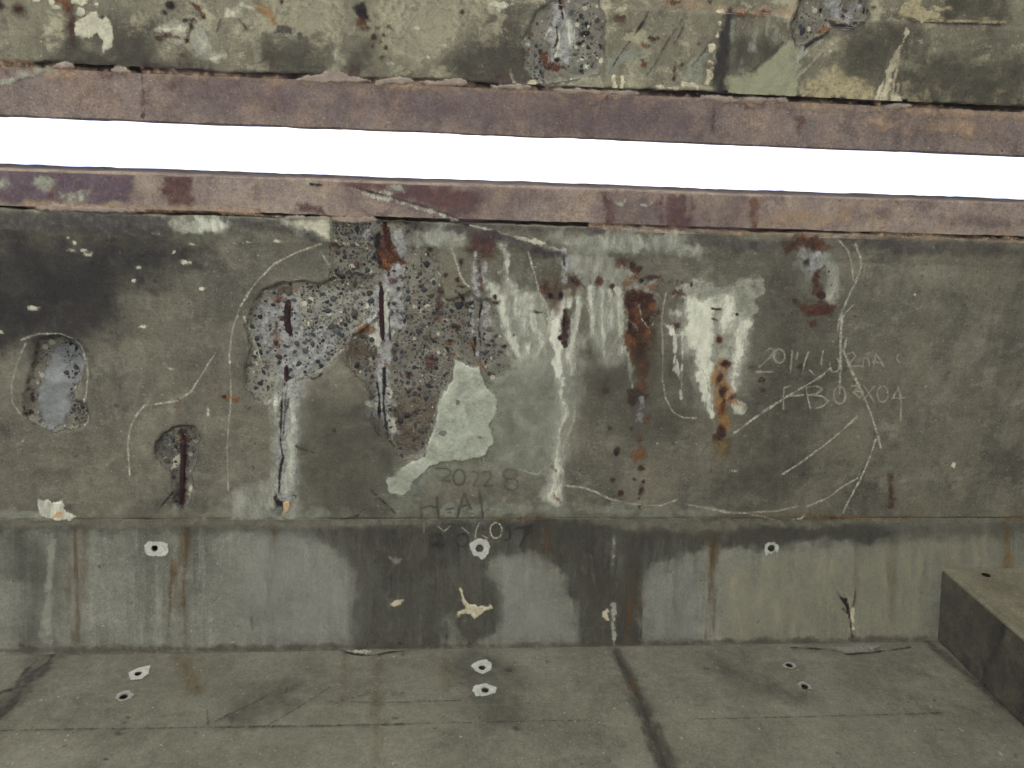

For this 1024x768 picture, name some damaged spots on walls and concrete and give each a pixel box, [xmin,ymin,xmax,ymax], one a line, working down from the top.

spalling [520,0,642,88]
peeling [655,8,734,90]
spalling [727,0,876,100]
rust [372,222,406,283]
rust [783,232,838,326]
spalling [21,333,91,433]
spalling [244,219,557,513]
rust [539,258,686,519]
rust [711,360,737,454]
spalling [155,425,201,512]
leakage [0,210,1024,768]
crack [839,591,911,655]